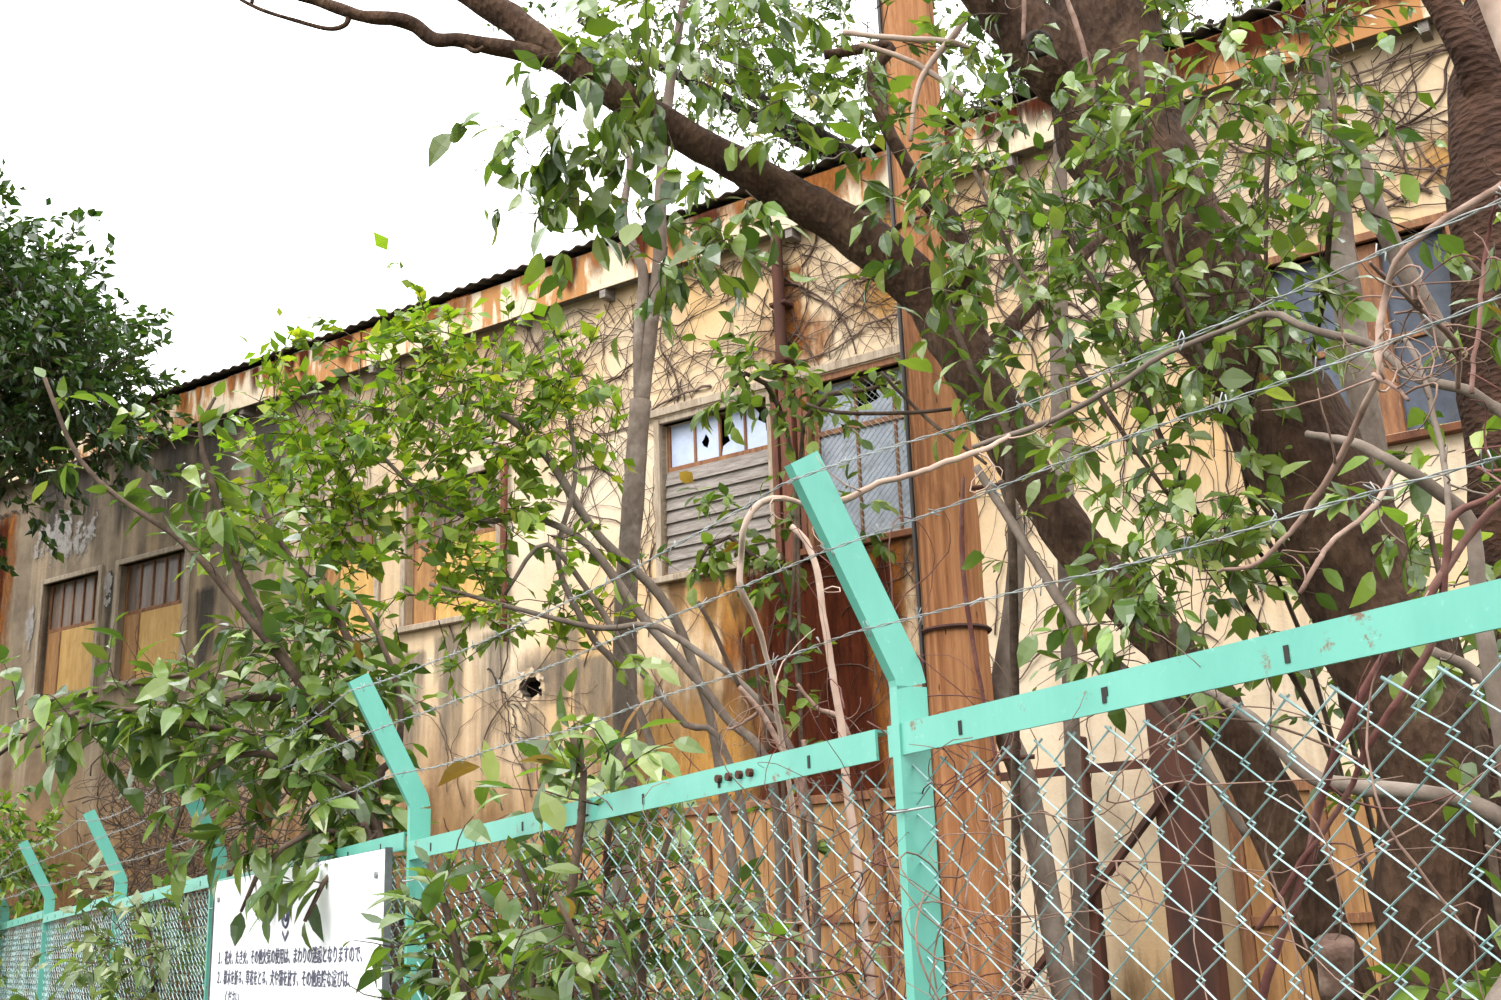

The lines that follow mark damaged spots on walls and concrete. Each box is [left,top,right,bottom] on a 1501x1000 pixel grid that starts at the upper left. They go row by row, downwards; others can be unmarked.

peeling [33,506,98,568]
peeling [24,605,35,661]
spalling [516,652,562,707]